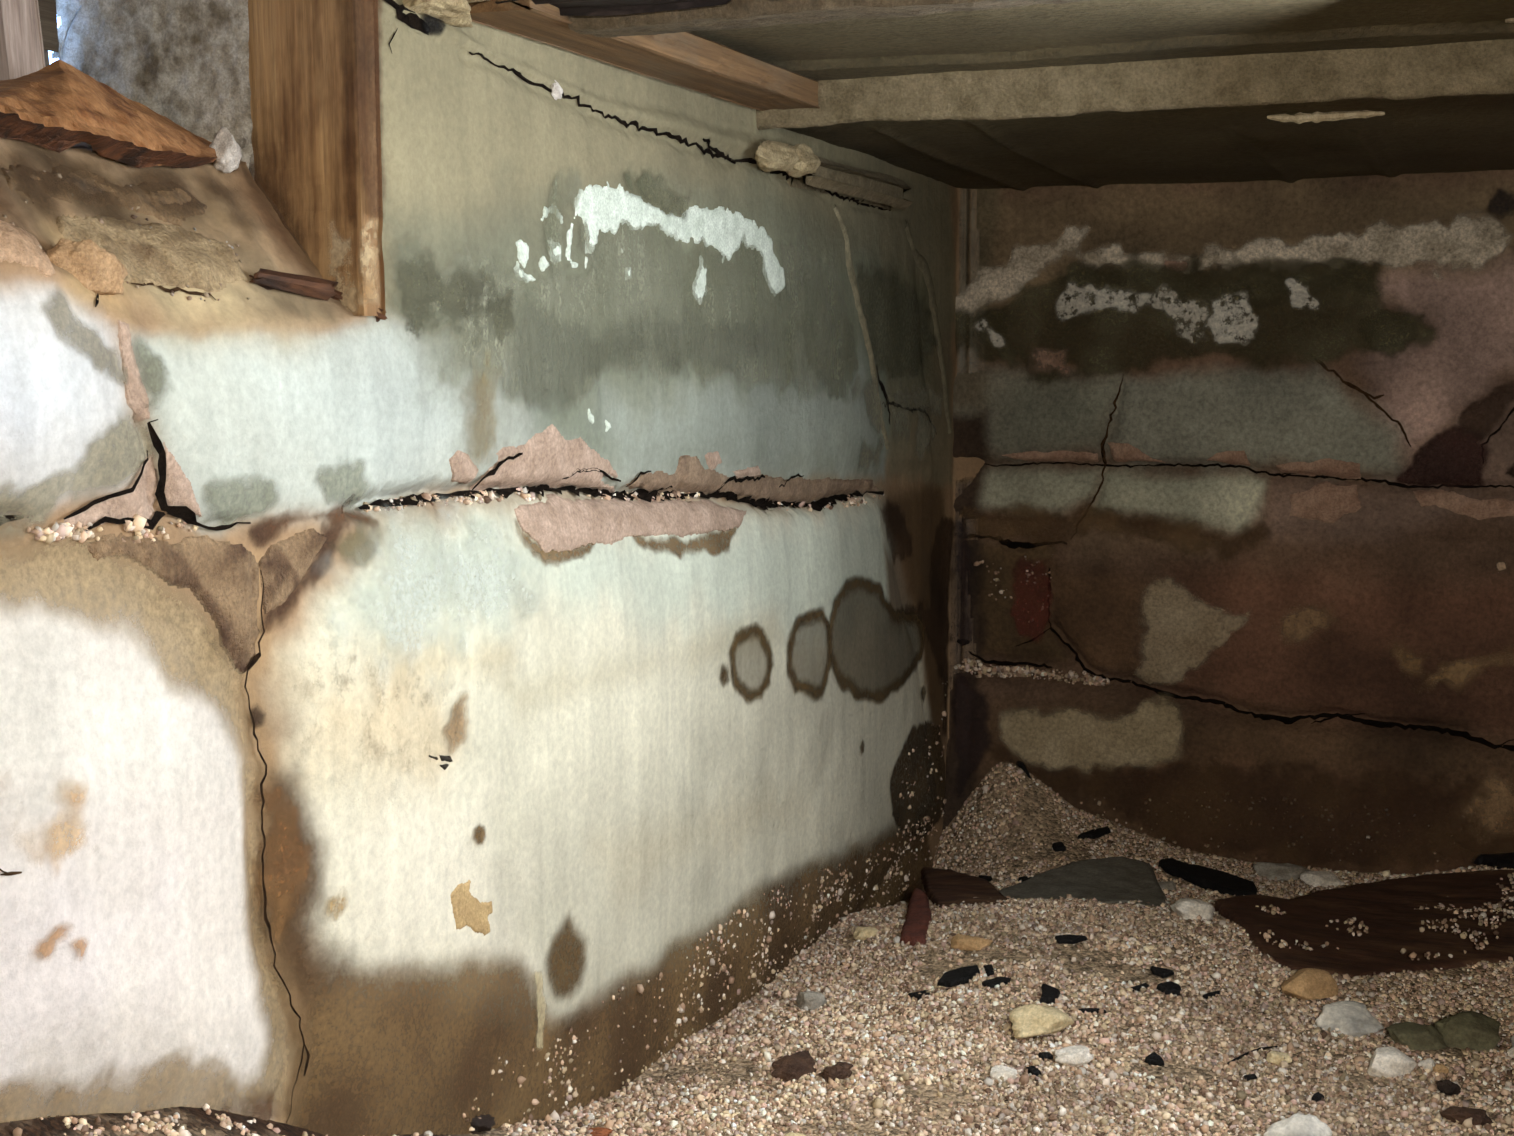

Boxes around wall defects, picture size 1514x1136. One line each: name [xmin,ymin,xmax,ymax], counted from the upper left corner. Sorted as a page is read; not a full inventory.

crack [469,52,891,211]
peeling [514,182,785,305]
water stain [399,172,1435,400]
water stain [0,416,153,532]
spalling [118,320,150,423]
water stain [264,462,378,630]
crack [358,453,884,511]
spalling [449,396,879,553]
crack [957,378,1514,752]
water stain [1397,384,1514,487]
crack [244,570,310,1124]
water stain [0,503,1514,1136]